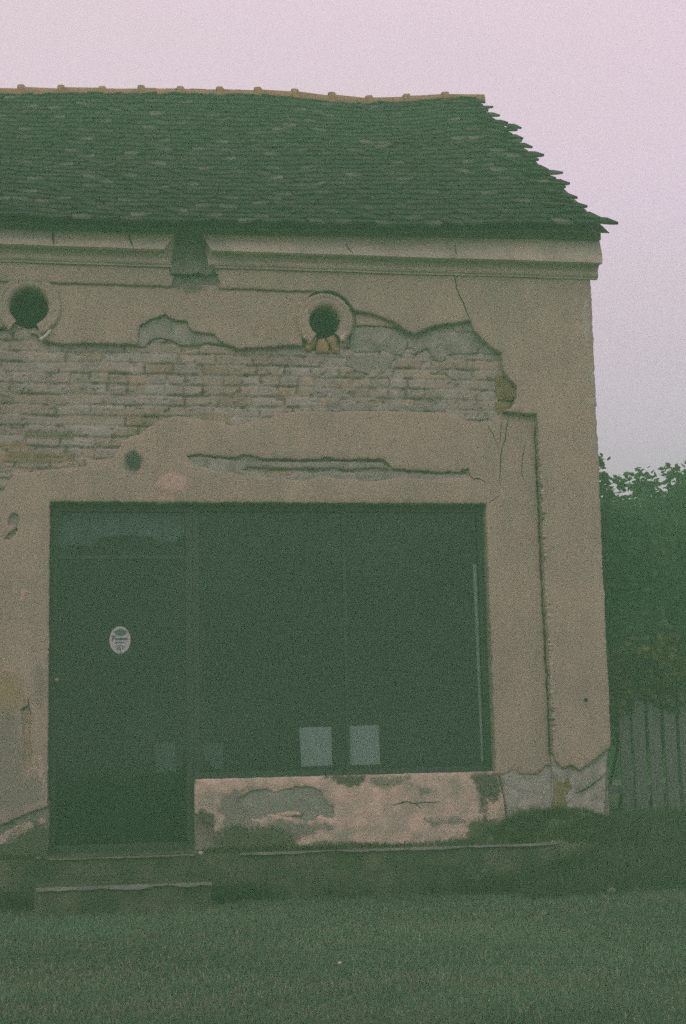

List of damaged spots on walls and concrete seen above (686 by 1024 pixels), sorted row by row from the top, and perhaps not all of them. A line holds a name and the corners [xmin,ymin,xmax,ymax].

crack [454,245,471,321]
spalling [135,314,223,348]
crack [468,421,525,503]
spalling [498,451,608,816]
spalling [237,786,334,822]